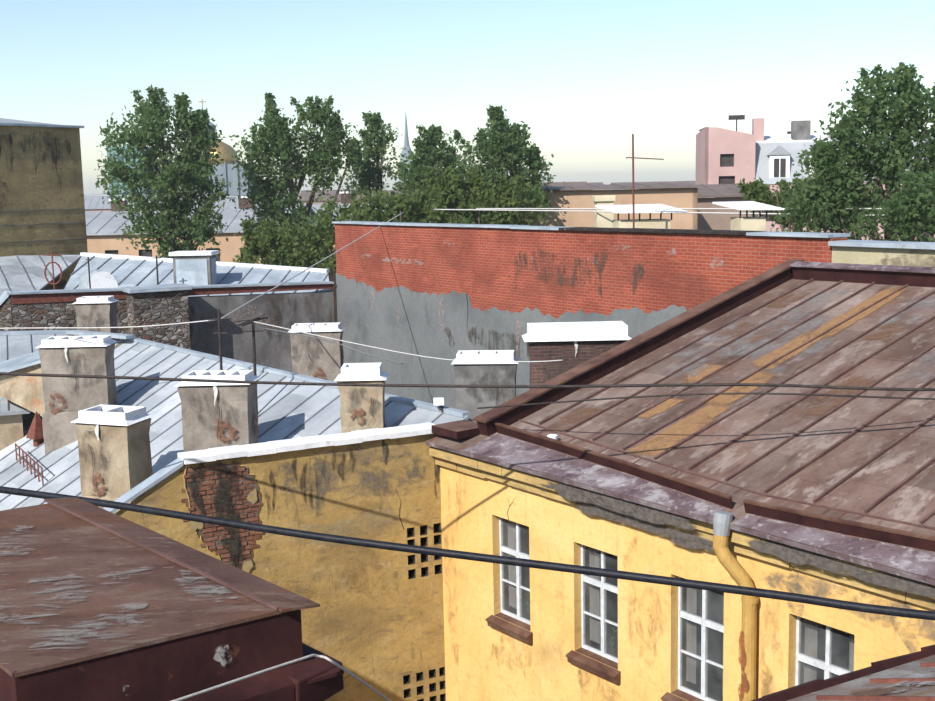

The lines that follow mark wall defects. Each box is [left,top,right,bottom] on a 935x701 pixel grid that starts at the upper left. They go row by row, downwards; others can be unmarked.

peeling [336,273,691,409]
water stain [265,439,424,511]
flaking render [180,460,263,573]
flaking render [556,482,714,552]
peeling [0,575,91,624]
peeling [31,603,147,649]
peeling [177,570,237,602]
peeling [214,645,232,666]
corrosion [738,631,749,701]